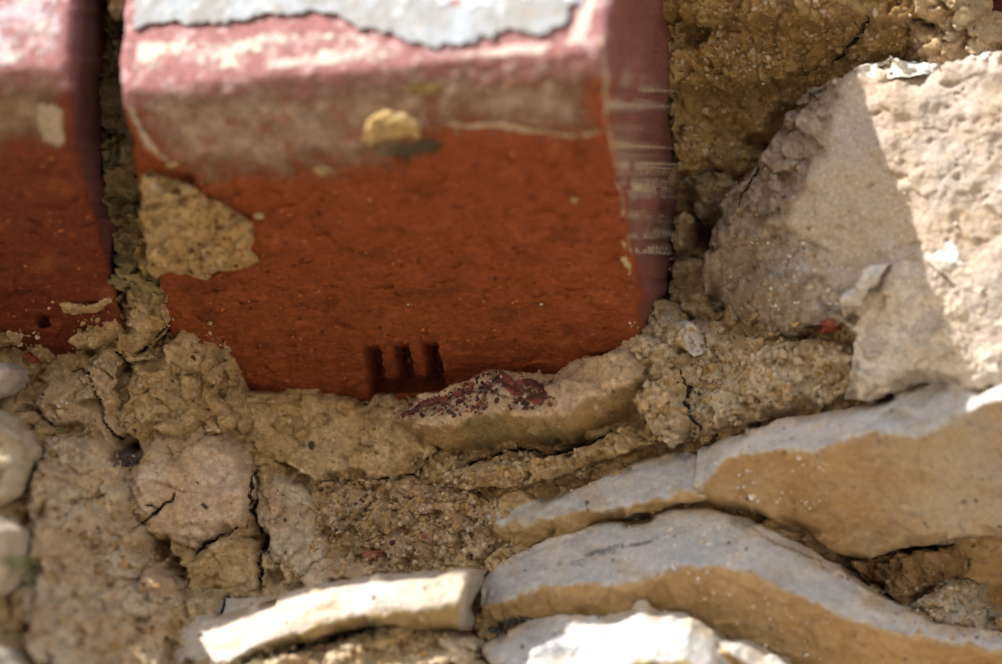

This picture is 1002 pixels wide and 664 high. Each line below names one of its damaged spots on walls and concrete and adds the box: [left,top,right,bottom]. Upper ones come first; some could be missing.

flaking render [132,0,587,48]
spalling [0,87,65,147]
spalling [129,73,601,176]
peeling [839,263,891,309]
crack [134,493,176,529]
crack [194,472,269,584]